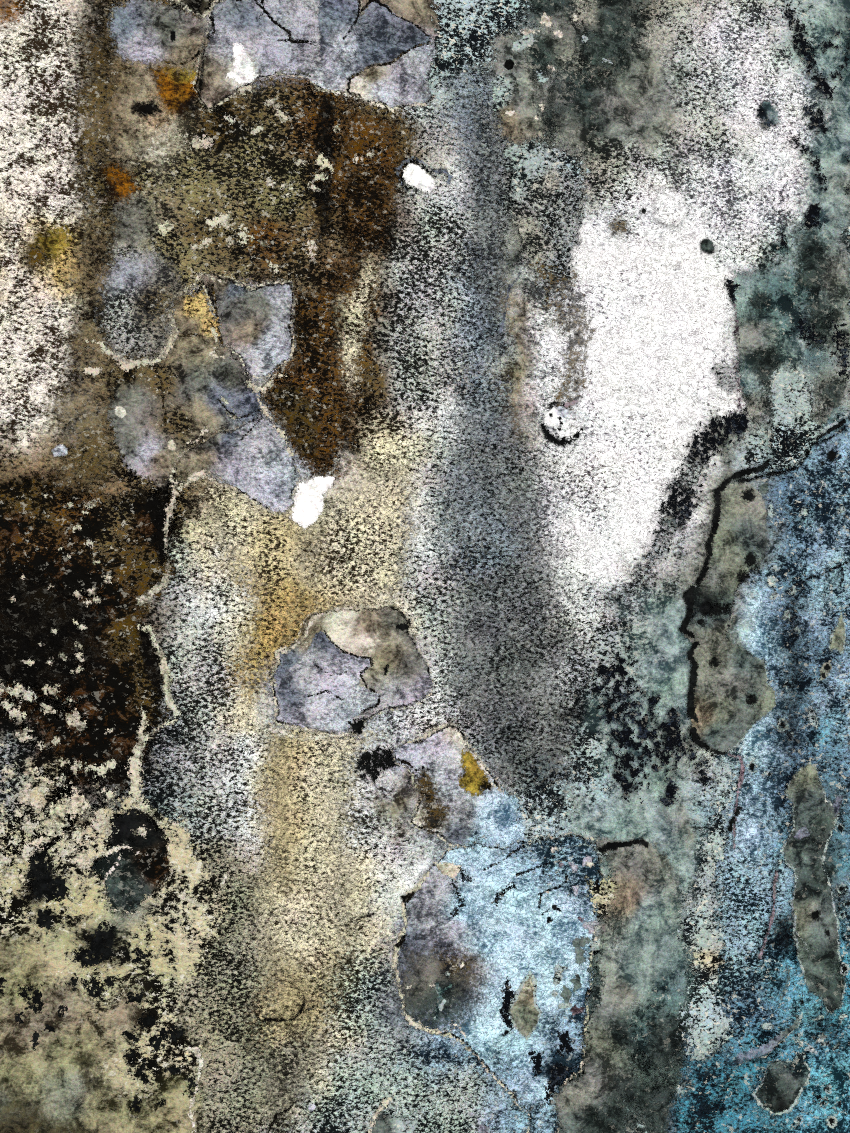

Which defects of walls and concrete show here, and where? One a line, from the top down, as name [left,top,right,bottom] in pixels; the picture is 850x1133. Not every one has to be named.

corrosion [86,64,417,485]
crack [734,383,850,483]
crack [794,560,850,587]
flaking render [268,594,435,741]